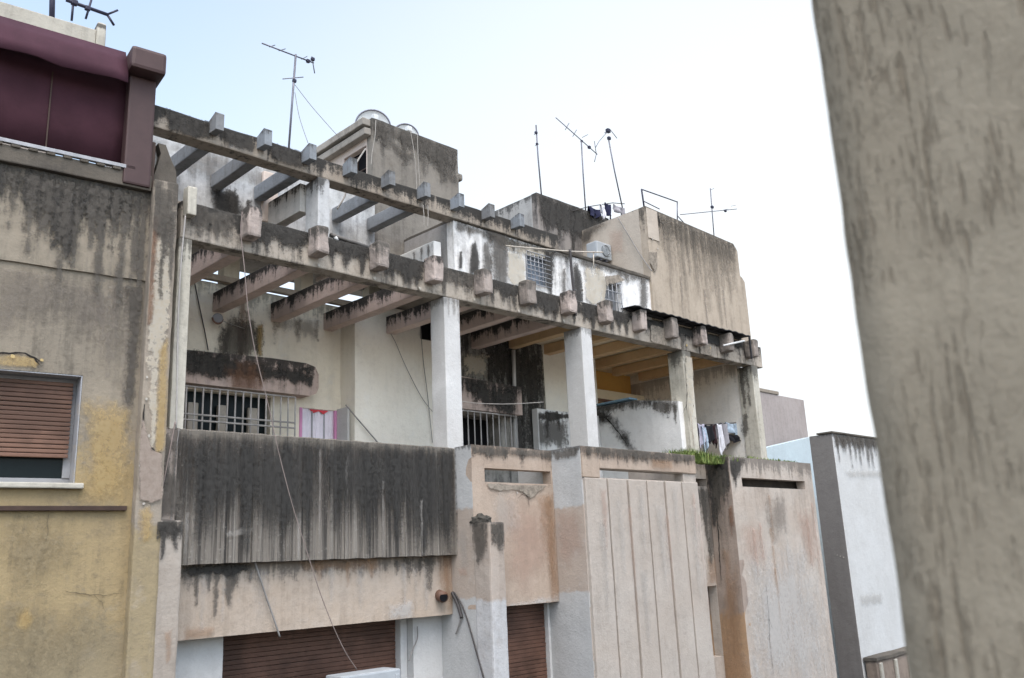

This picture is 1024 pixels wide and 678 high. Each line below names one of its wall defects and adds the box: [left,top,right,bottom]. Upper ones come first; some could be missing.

damp [374,122,457,182]
damp [0,163,252,404]
peeling [139,240,171,505]
damp [186,317,313,387]
damp [678,326,693,349]
damp [703,334,742,355]
damp [465,341,745,563]
damp [834,434,877,467]
damp [156,432,458,589]
damp [182,563,252,615]